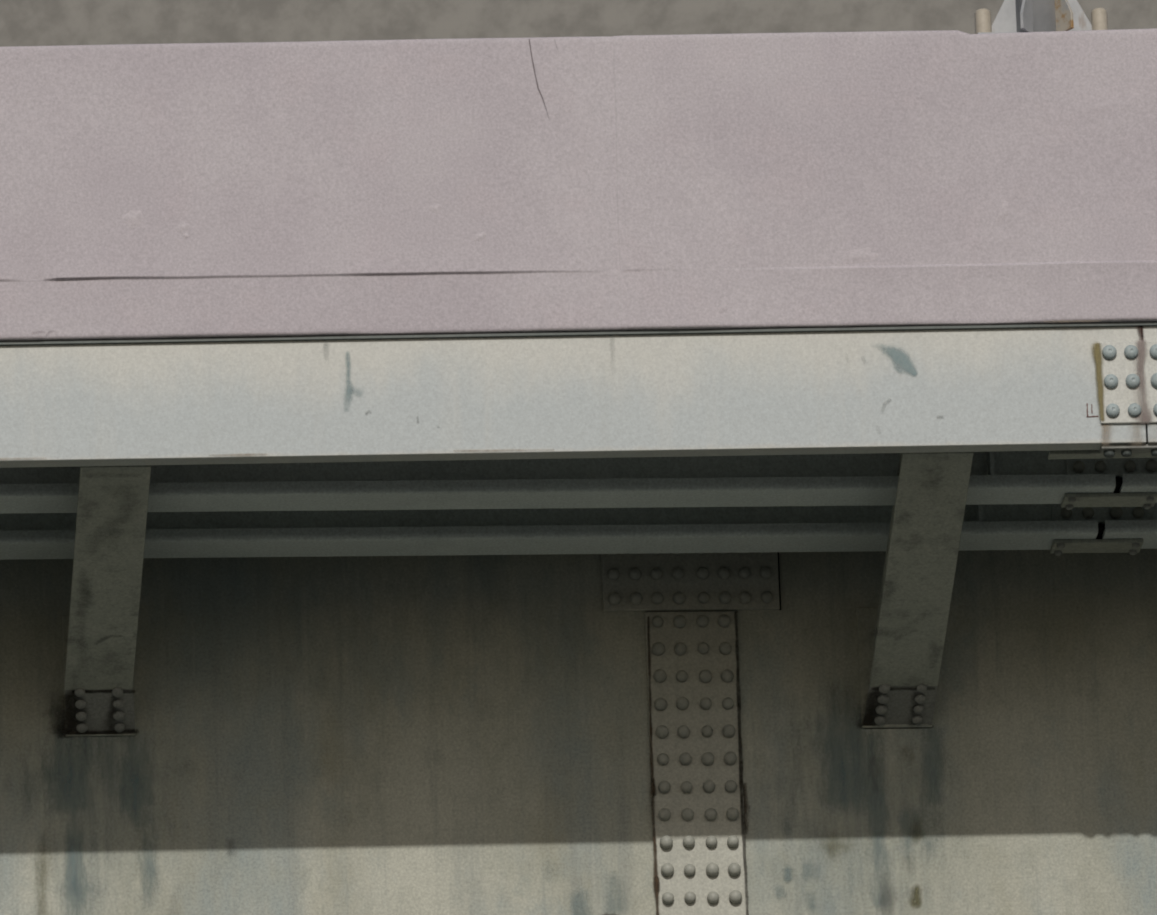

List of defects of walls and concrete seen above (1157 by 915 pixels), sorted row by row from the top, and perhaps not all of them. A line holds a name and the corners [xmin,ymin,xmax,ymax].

crack [529,39,544,102]
leakage [912,887,920,906]